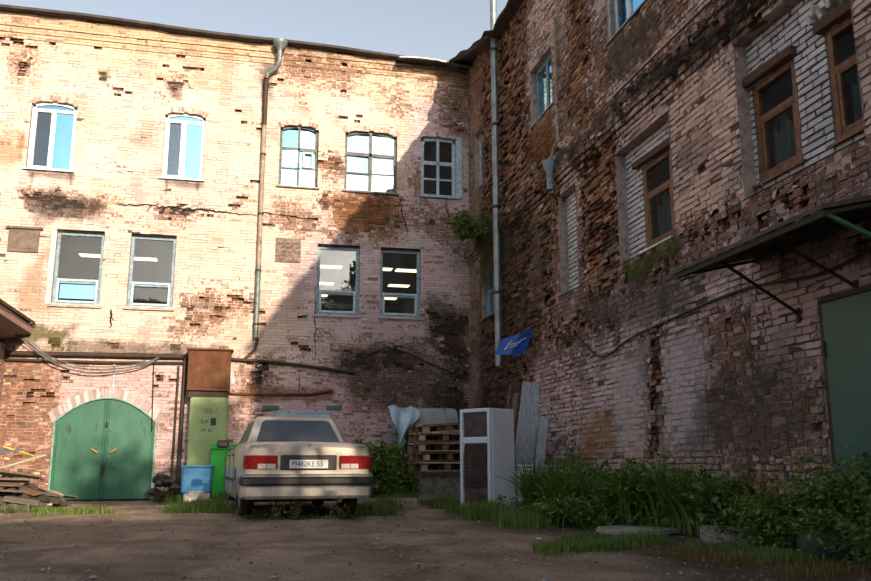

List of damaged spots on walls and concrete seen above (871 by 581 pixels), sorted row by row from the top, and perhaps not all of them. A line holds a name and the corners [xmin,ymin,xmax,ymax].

spalling [24,191,84,211]
crack [119,204,309,221]
spalling [263,190,404,243]
peeling [407,170,464,254]
spalling [424,0,773,457]
spalling [756,170,822,235]
peeling [167,291,266,351]
damp [425,298,469,414]